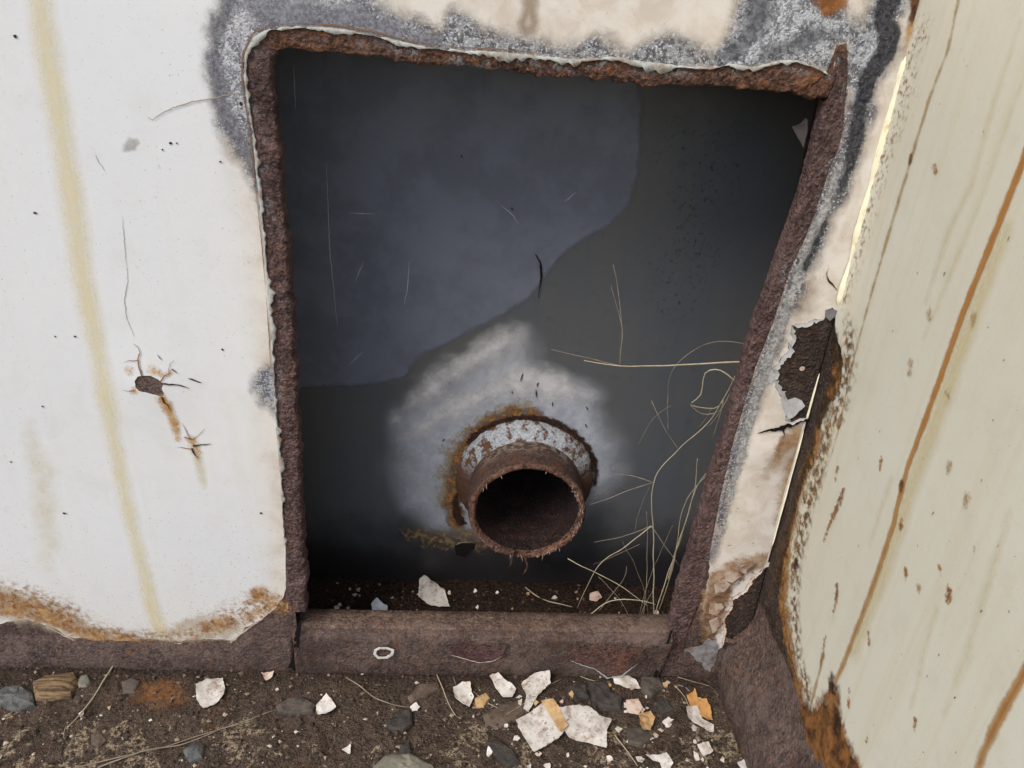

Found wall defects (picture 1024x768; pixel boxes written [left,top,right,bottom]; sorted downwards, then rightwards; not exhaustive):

damp [521,0,536,33]
rust [241,23,543,368]
damp [803,221,827,271]
damp [838,99,866,193]
rust [895,70,940,210]
damp [36,0,165,635]
peeling [124,344,187,438]
peeling [768,308,837,422]
rust [402,401,599,558]
rust [773,148,1024,768]
rust [251,588,267,603]
peeling [684,554,768,672]